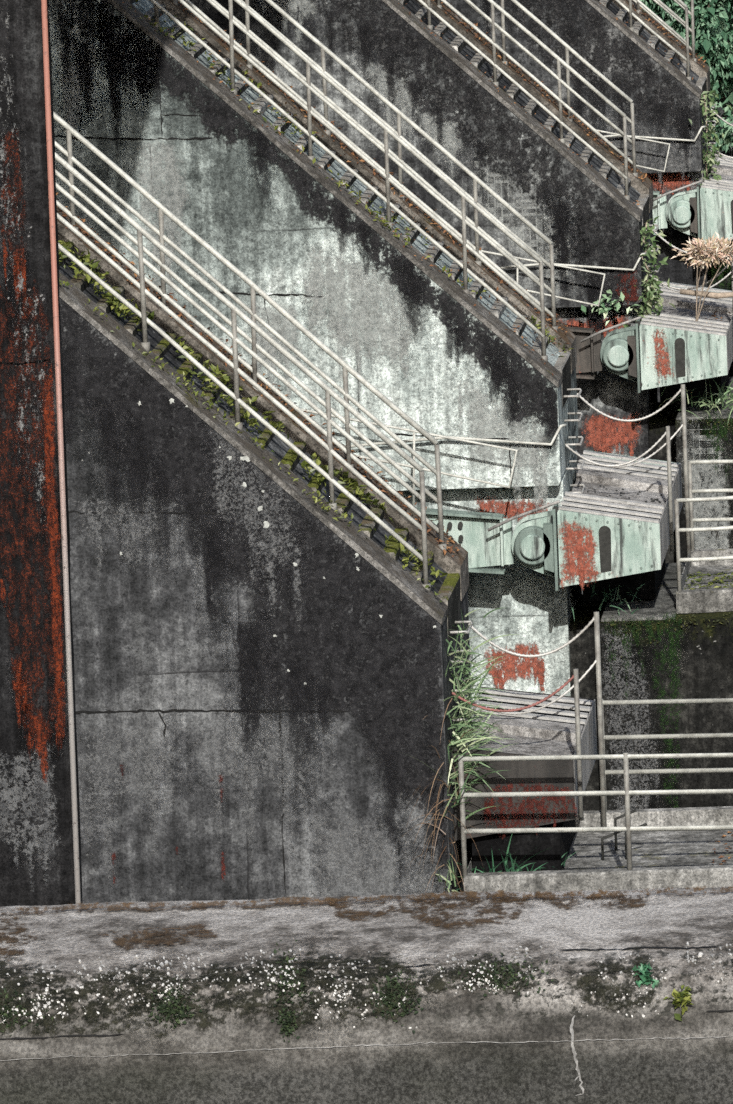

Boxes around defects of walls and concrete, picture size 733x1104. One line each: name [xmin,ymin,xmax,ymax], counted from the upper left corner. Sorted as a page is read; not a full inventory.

water stain [53,0,558,508]
corrosion [0,128,66,781]
corrosion [581,414,641,456]
corrosion [653,329,674,383]
crack [76,709,349,892]
water stain [60,299,449,896]
corrosion [485,642,545,694]
corrosion [483,782,577,838]
corrosion [559,522,599,589]
water stain [602,631,678,810]